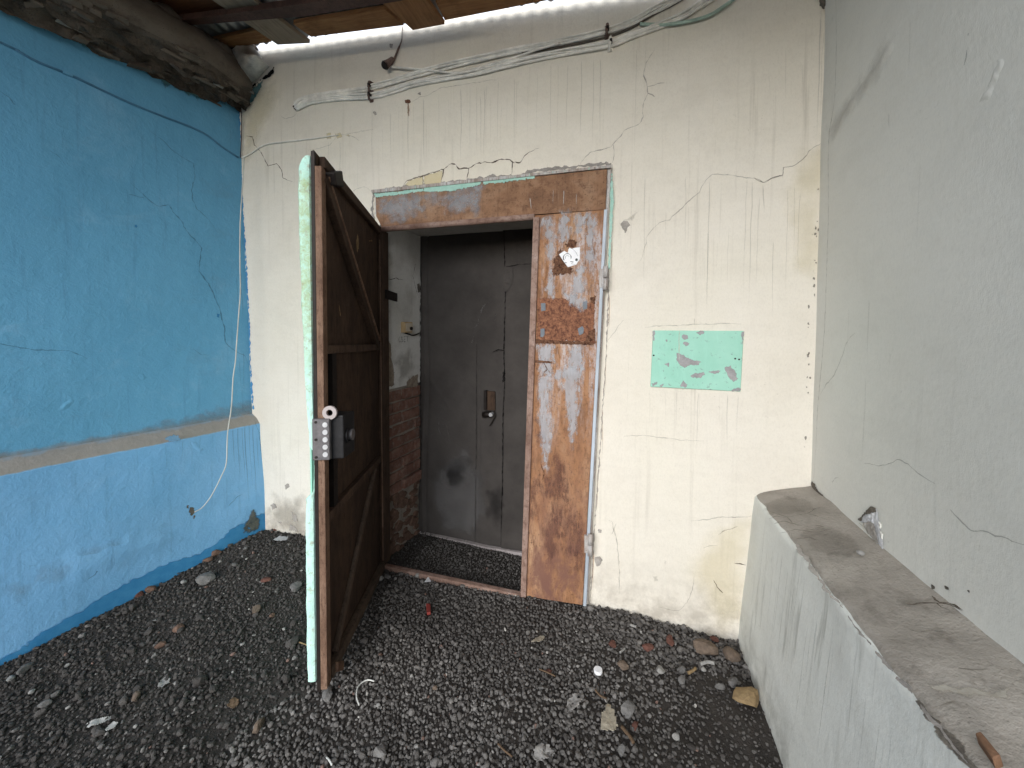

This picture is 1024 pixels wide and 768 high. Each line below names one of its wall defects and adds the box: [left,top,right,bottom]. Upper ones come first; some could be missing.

crack [402,148,538,187]
rust [552,239,577,276]
rust [535,296,596,345]
spalling [370,161,630,605]